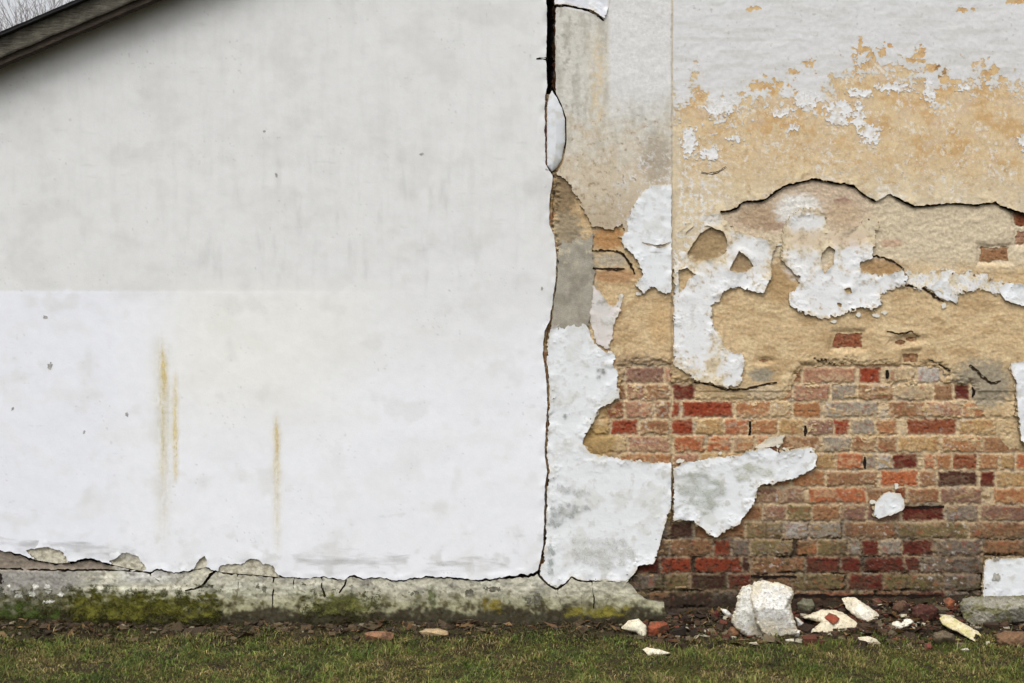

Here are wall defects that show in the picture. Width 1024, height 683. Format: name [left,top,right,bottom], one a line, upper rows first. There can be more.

crack [536,0,604,263]
peeling [678,36,1024,184]
crack [720,178,1024,215]
peeling [527,184,1024,606]
flaking render [27,547,70,563]
flaking render [110,552,146,571]
flaking render [194,556,280,593]
crack [0,414,595,619]